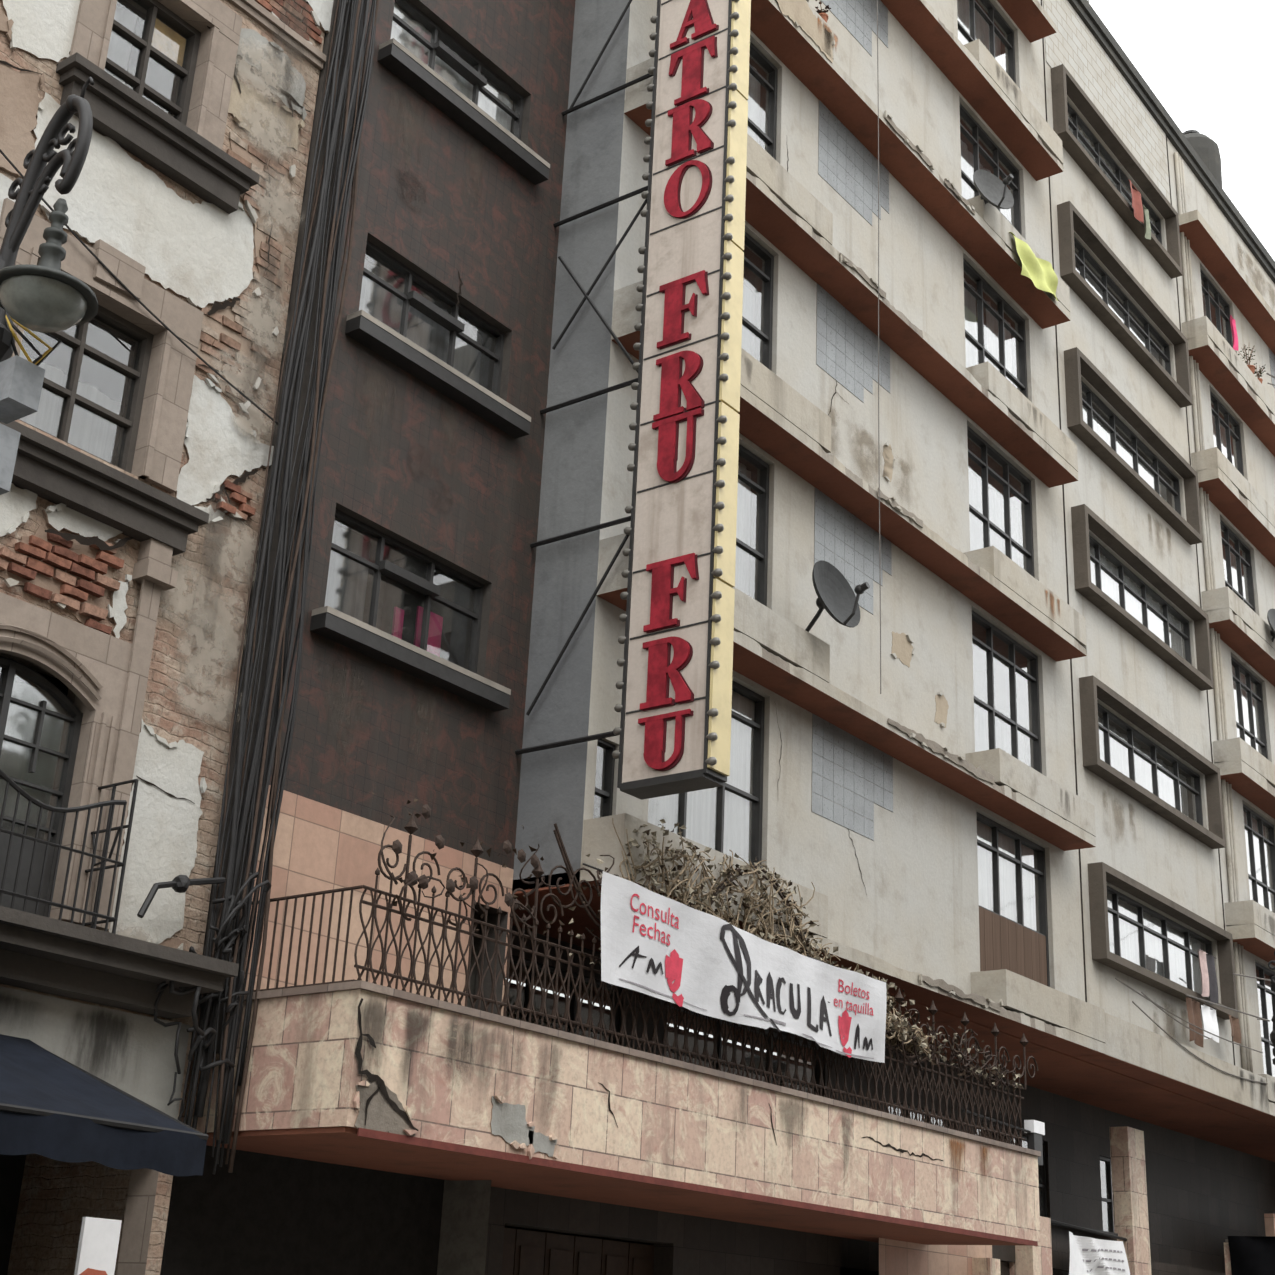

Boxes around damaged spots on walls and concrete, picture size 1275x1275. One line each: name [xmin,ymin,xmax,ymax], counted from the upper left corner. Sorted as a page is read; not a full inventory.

flaking render [254,0,348,47]
flaking render [0,0,80,216]
flaking render [39,28,307,524]
flaking render [0,483,132,639]
peeling [891,631,915,668]
crack [355,998,418,1131]
peeling [490,1096,559,1159]
crack [862,1136,943,1161]